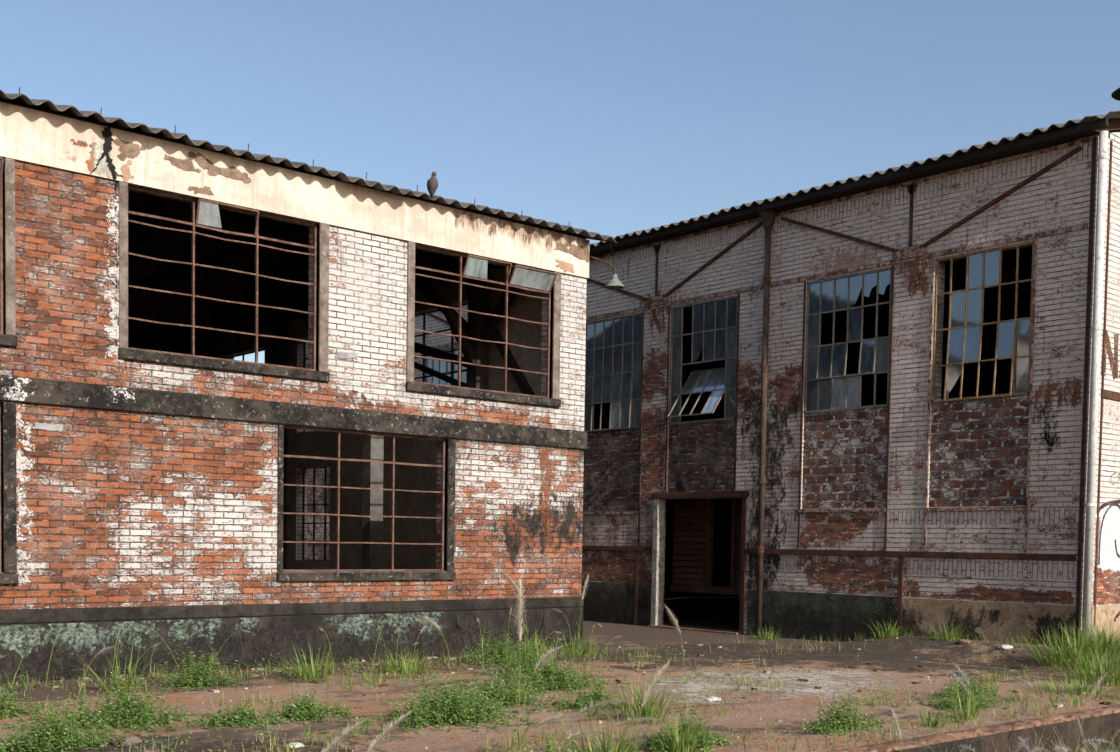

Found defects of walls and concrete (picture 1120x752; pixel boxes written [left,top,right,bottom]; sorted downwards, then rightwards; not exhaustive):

spalling [113,138,146,182]
spalling [164,151,251,195]
peeling [0,142,127,387]
crack [90,127,123,346]
peeling [640,345,669,498]
peeling [0,617,259,660]
peeling [0,402,278,609]
water stain [0,583,651,684]
water stain [488,492,583,567]
water stain [576,390,1082,704]
peeling [794,510,1074,605]
peeling [1092,566,1120,605]